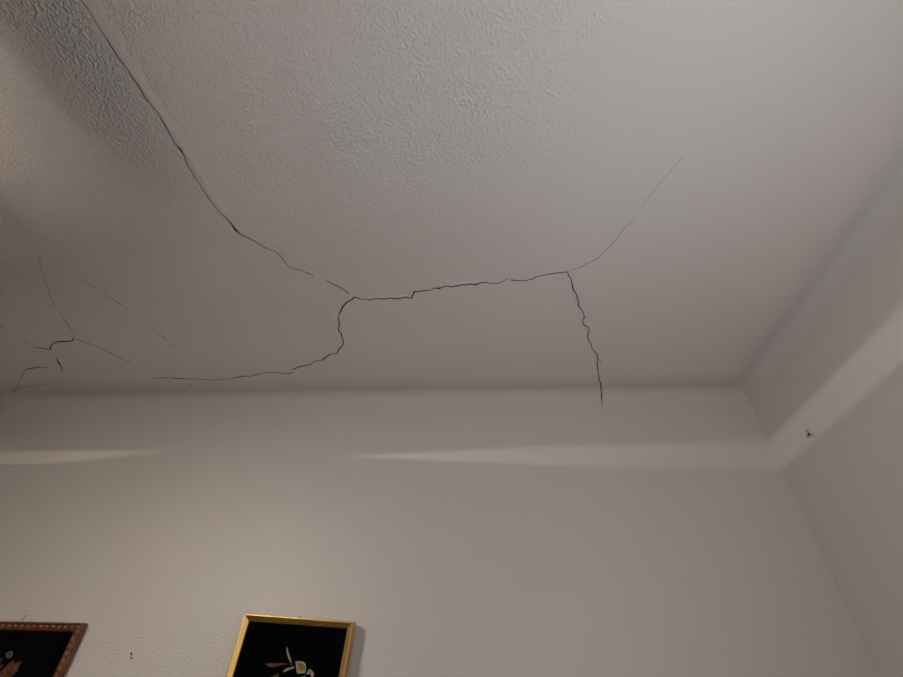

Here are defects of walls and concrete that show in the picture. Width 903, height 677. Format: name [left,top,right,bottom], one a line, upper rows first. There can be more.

crack [80,0,682,406]